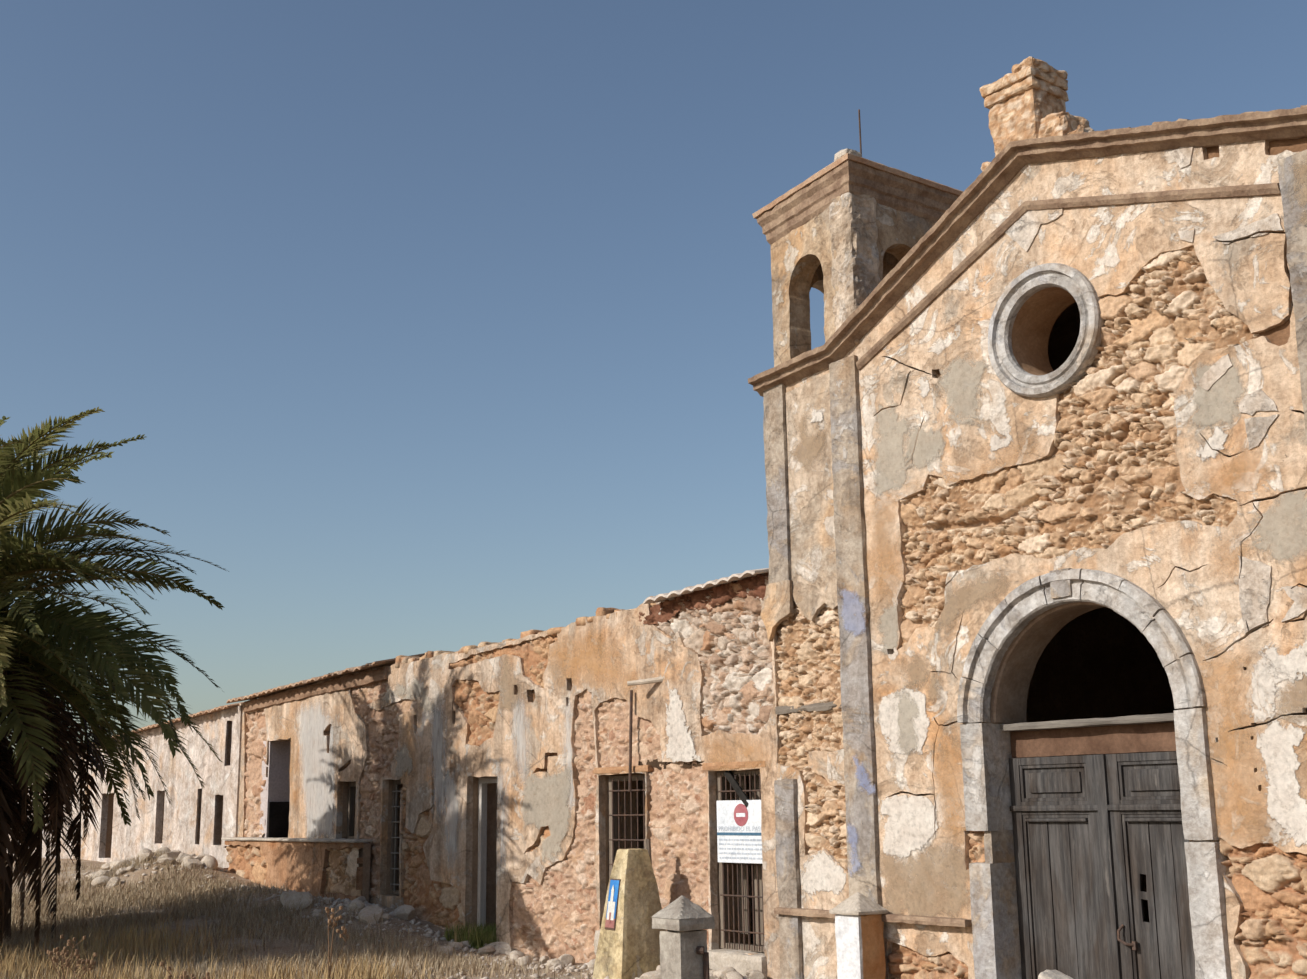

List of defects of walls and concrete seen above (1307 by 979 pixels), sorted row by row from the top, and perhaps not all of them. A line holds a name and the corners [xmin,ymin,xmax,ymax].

peeling [1196,354,1233,391]